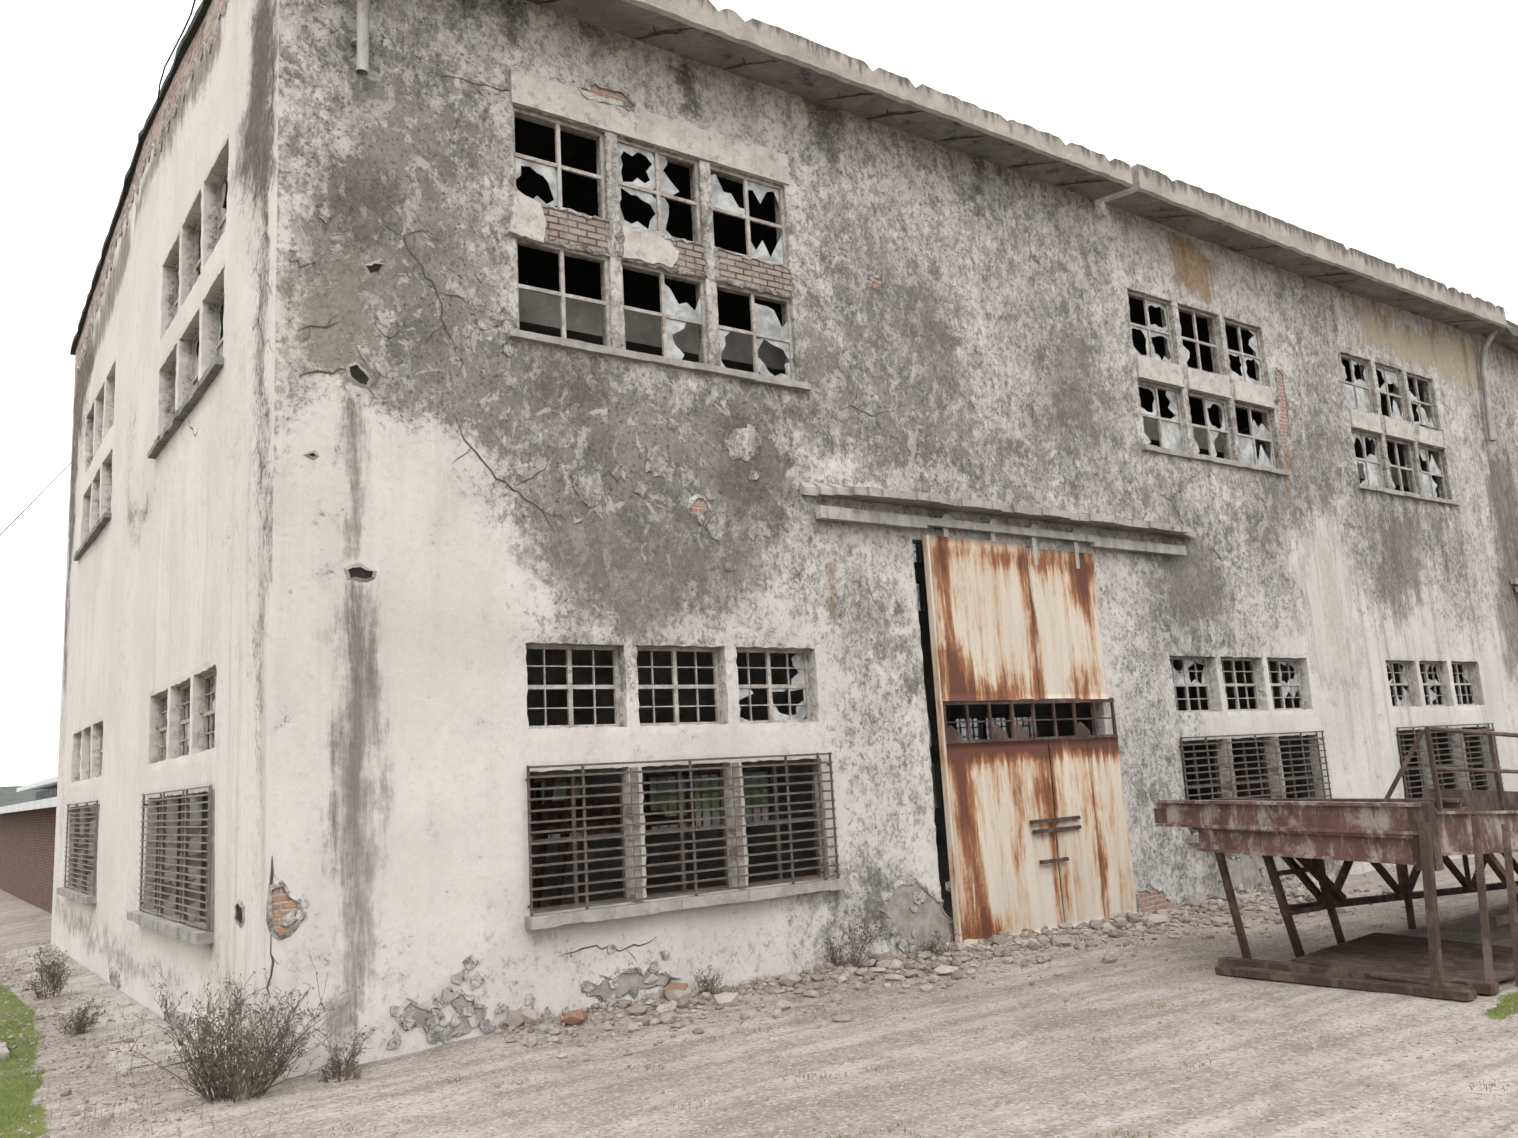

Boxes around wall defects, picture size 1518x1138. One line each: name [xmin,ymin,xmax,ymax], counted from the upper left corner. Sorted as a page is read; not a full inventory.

water stain [459,0,528,45]
water stain [241,0,278,240]
water stain [669,59,705,122]
water stain [803,98,844,165]
water stain [290,175,406,382]
crack [382,220,474,360]
flaking render [541,204,796,298]
water stain [716,408,806,531]
water stain [1487,460,1518,675]
water stain [334,616,375,1025]
flaking render [266,880,309,941]
spalling [387,954,553,1049]